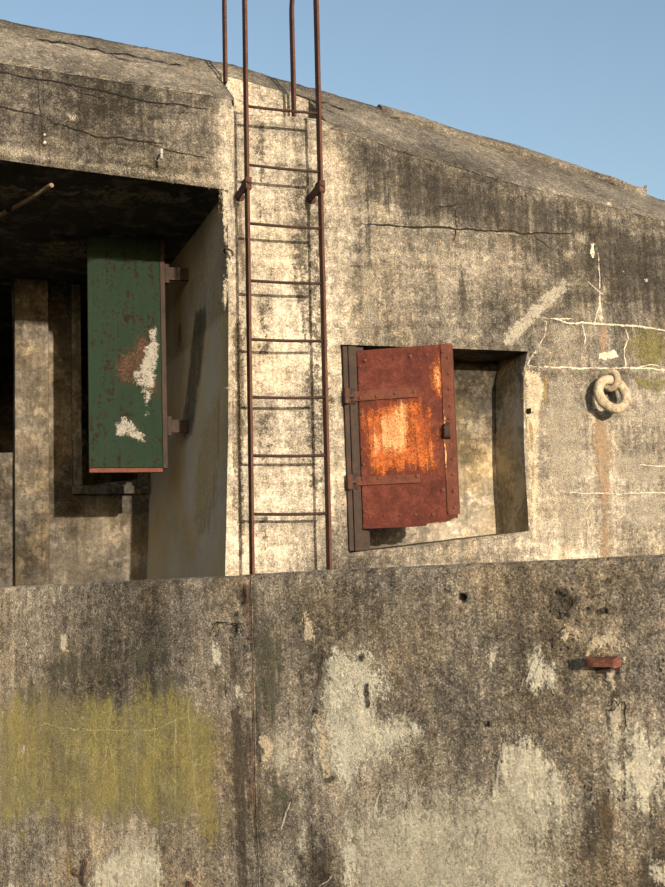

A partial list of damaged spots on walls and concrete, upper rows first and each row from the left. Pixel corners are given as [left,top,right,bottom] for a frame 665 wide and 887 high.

crack [35,38,188,66]
crack [0,71,212,158]
crack [360,203,574,249]
crack [527,254,665,371]
peeling [115,327,161,406]
corrosion [431,358,442,398]
peeling [116,416,145,441]
corrosion [361,400,447,476]
water stain [300,611,317,641]
water stain [560,623,633,661]
water stain [606,670,622,737]
water stain [635,846,665,887]